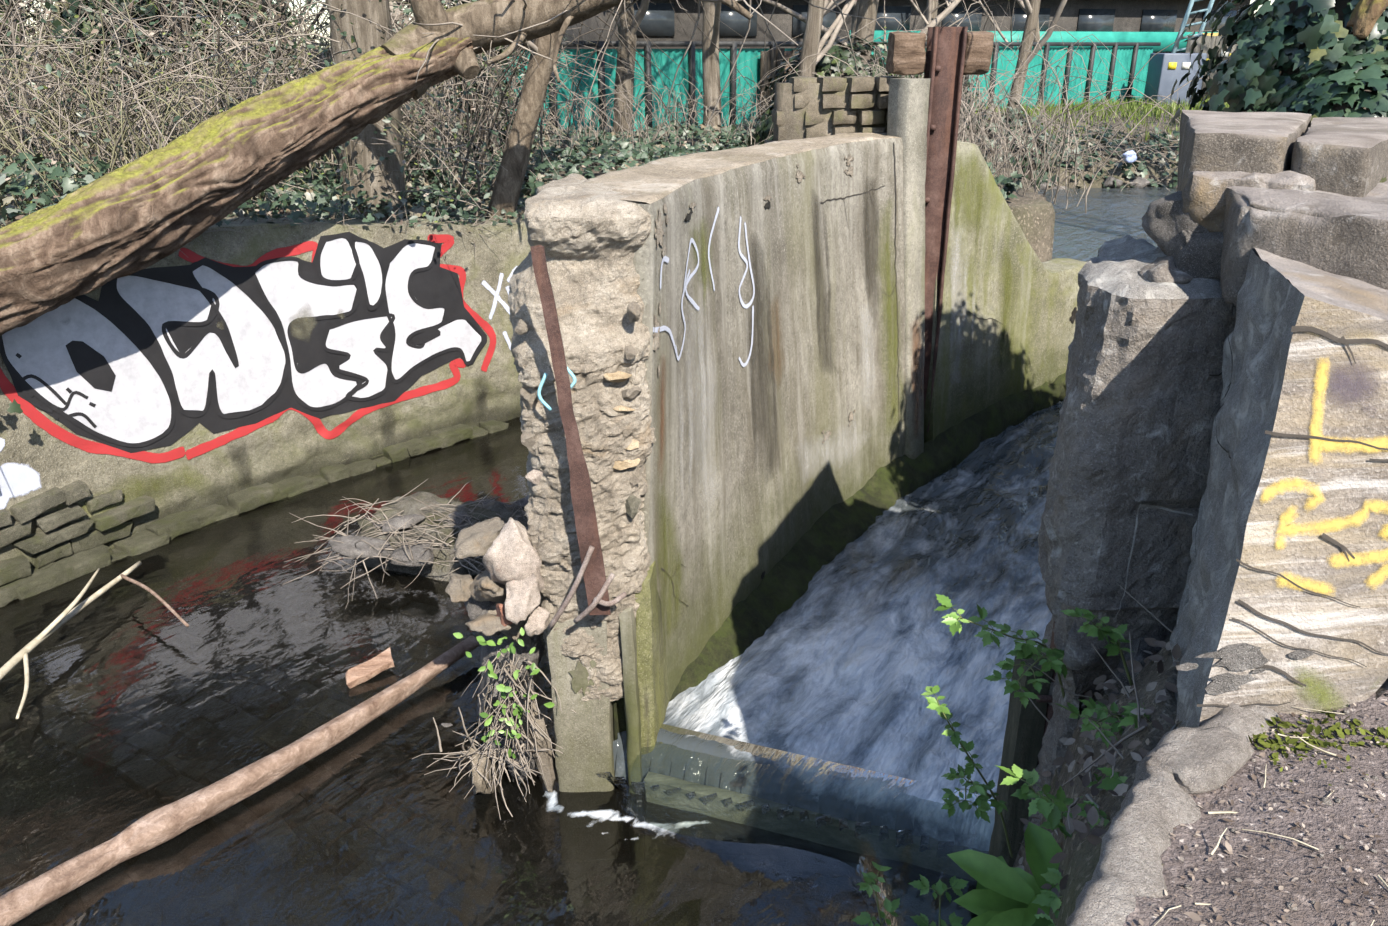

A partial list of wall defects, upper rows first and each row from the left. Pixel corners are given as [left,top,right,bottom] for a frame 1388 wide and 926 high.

leakage [815,202,831,365]
leakage [865,187,897,352]